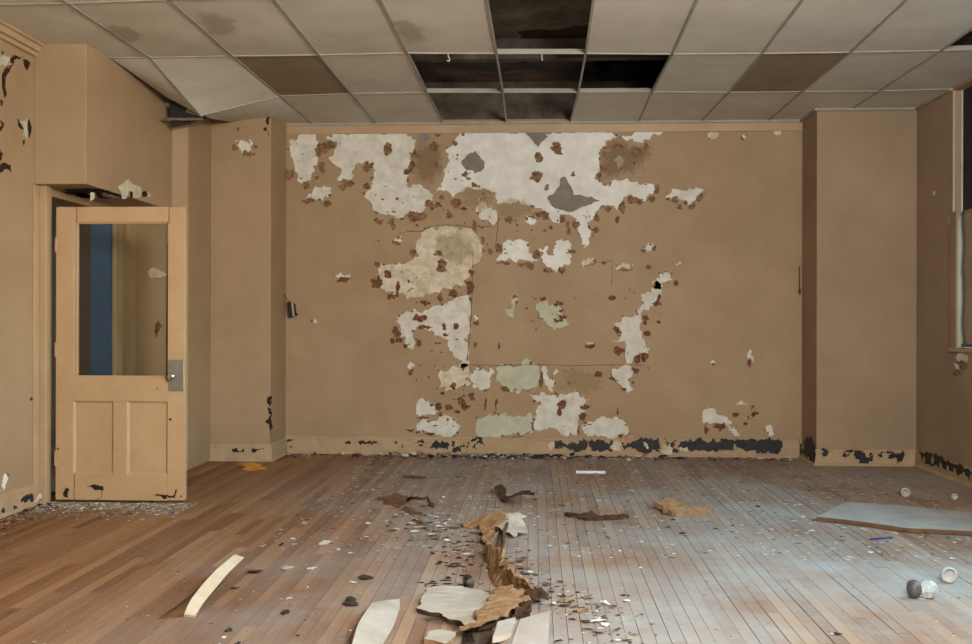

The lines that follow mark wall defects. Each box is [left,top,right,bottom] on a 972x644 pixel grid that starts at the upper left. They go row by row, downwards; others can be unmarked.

peeling [0,51,30,106]
peeling [18,117,32,145]
peeling [231,127,258,157]
peeling [286,130,783,455]
peeling [952,352,972,384]
peeling [265,396,273,436]
peeling [799,435,829,463]
peeling [842,449,905,464]
peeling [919,451,972,481]